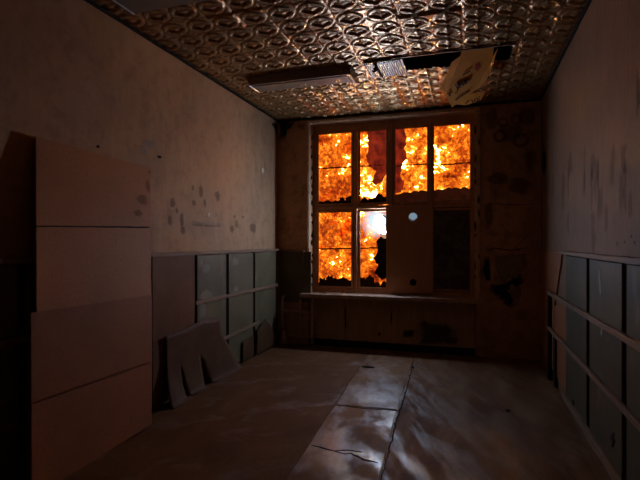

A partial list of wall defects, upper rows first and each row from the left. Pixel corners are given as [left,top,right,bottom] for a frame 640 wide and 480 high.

crack [312,357,414,480]